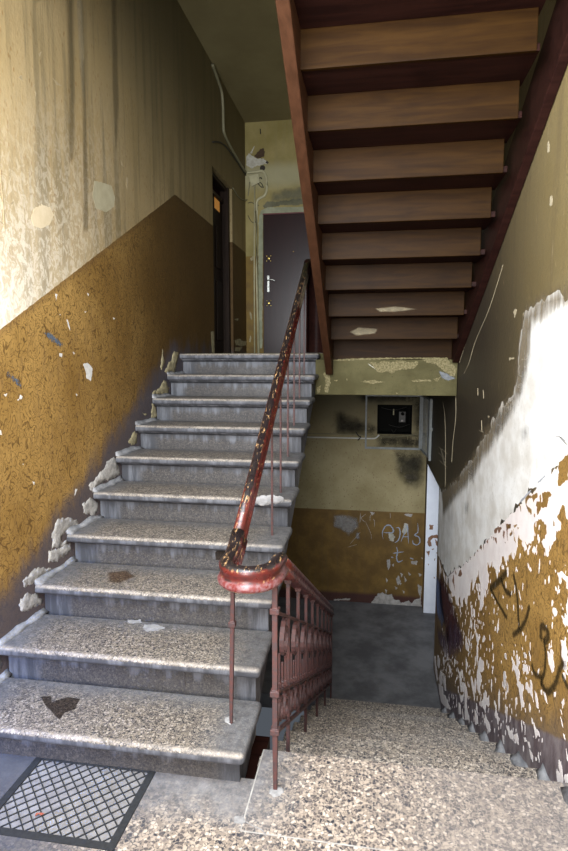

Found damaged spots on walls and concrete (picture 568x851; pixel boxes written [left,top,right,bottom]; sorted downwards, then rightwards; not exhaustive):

damp [263,188,303,208]
peeling [83,363,92,381]
spalling [143,349,179,418]
spalling [333,352,463,384]
spalling [82,457,120,516]
flaking render [371,290,568,762]
spalling [19,517,79,612]
peeling [556,750,568,783]